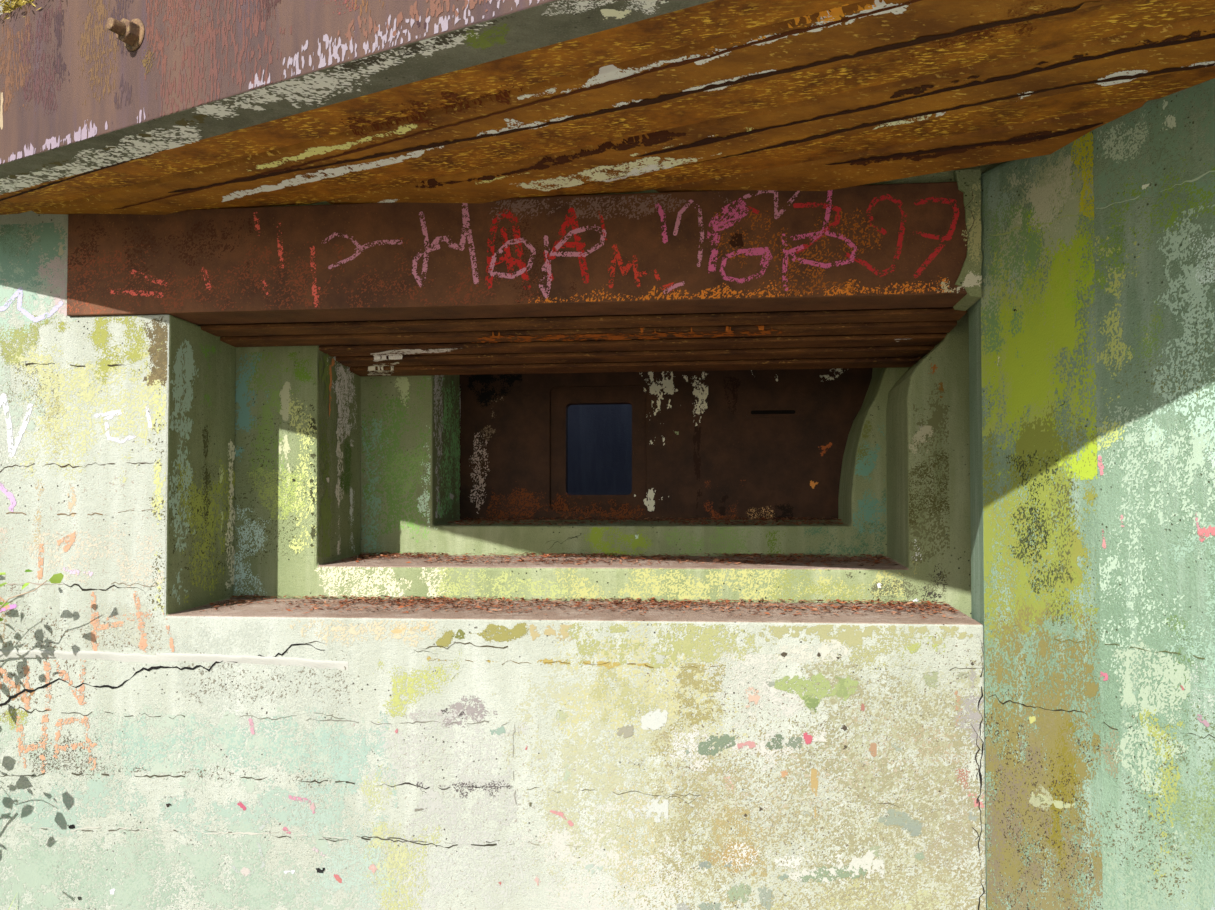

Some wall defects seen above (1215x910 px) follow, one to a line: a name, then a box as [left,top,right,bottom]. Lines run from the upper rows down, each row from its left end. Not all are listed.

damp [517,0,908,100]
corrosion [788,3,876,28]
corrosion [341,85,528,143]
corrosion [416,130,686,188]
damp [475,144,722,191]
corrosion [67,192,951,314]
spalling [1104,311,1215,401]
damp [278,382,292,505]
damp [459,374,522,514]
peeling [641,371,708,446]
crack [0,641,321,719]
crack [908,643,1215,910]